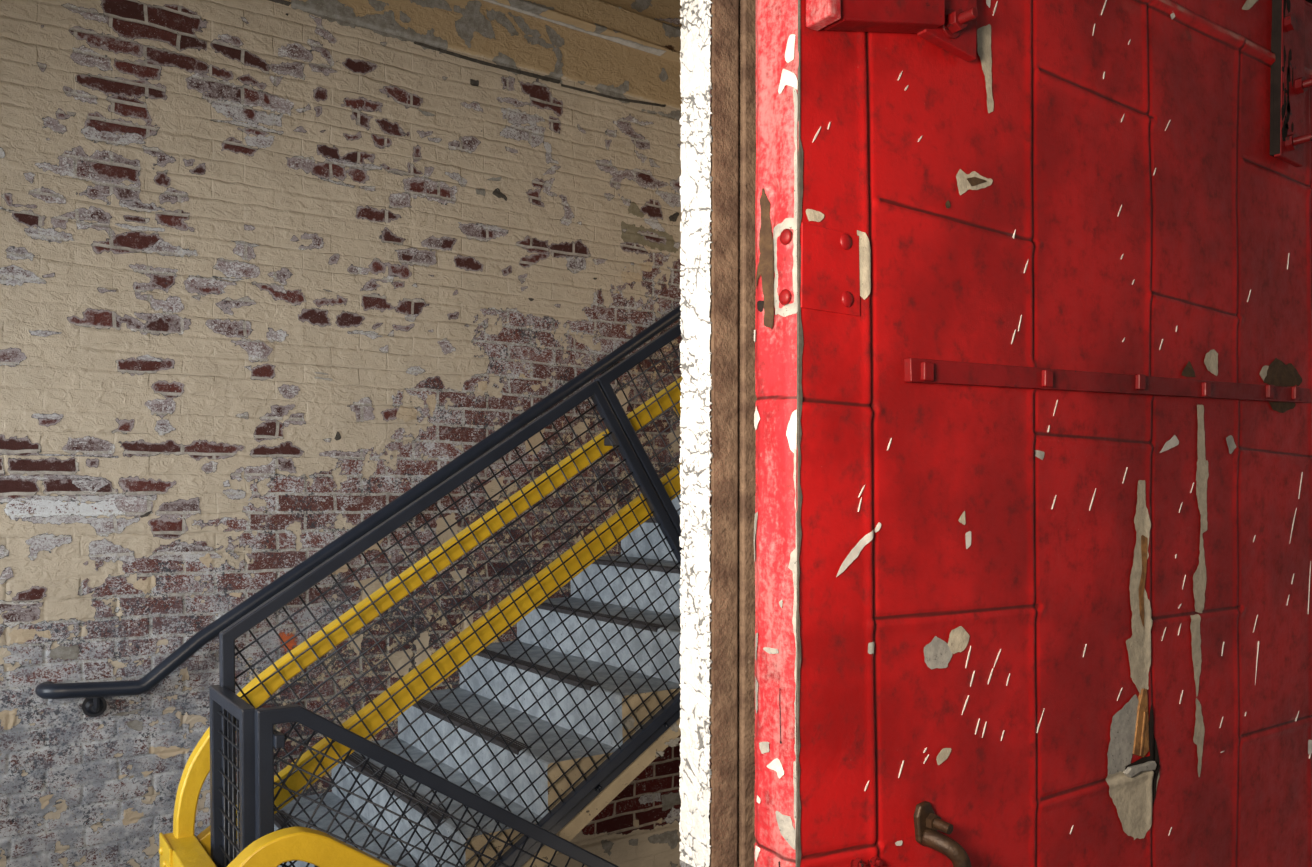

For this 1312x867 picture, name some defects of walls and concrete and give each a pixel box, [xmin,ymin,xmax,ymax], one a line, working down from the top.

flaking render [0,0,682,867]
crack [414,0,713,867]
peeling [754,34,824,341]
peeling [924,626,970,669]